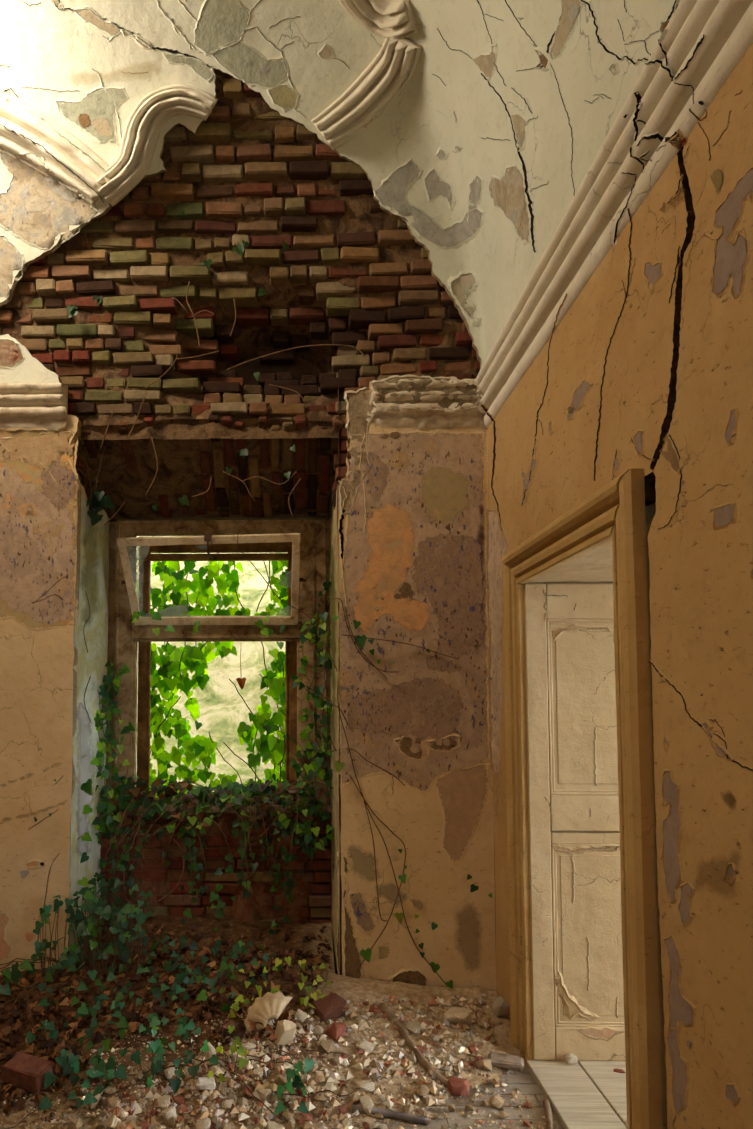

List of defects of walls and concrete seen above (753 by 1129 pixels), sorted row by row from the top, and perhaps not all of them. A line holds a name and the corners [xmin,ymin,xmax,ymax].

crack [0,0,307,203]
crack [432,73,457,123]
crack [436,0,742,531]
peeling [710,166,753,299]
spalling [0,0,532,864]
crack [649,659,753,772]